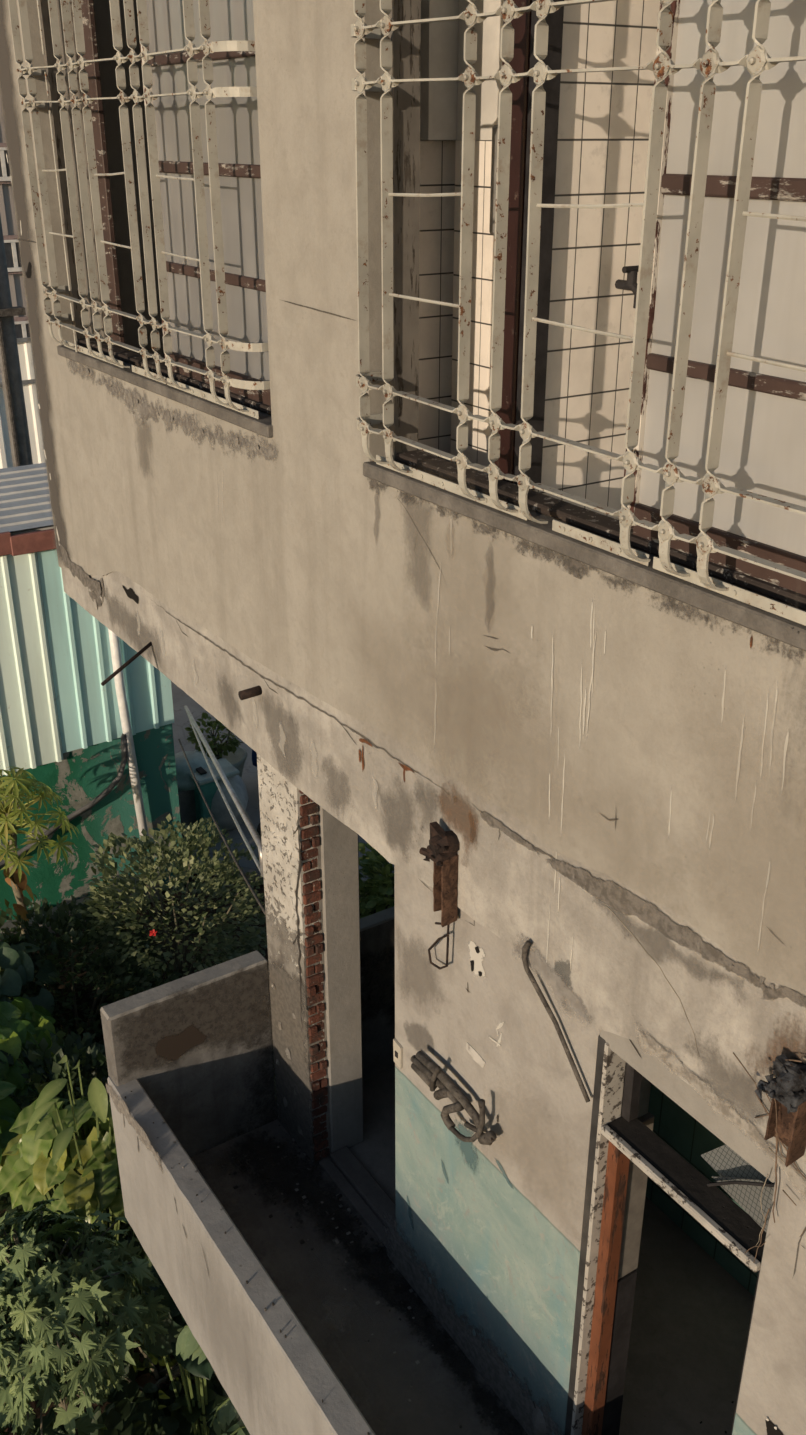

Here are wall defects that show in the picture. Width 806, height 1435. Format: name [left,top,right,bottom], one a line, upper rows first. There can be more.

spalling [56,527,104,610]
spalling [122,585,138,604]
corrosion [440,789,477,843]
peeling [268,963,317,1168]
water stain [115,965,527,1435]